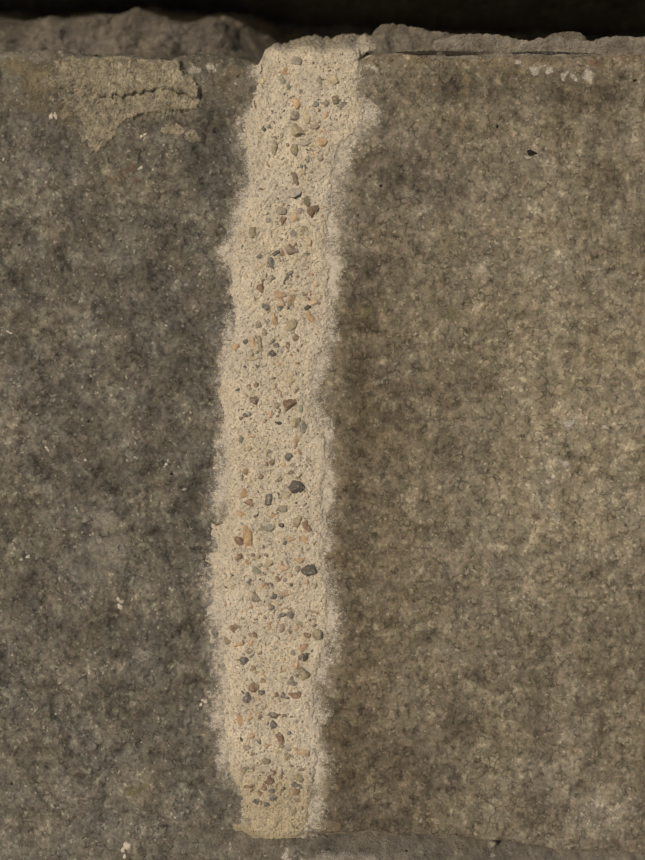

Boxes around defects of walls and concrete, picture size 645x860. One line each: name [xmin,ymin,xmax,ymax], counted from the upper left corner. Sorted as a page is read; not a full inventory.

peeling [34,54,204,157]
leakage [208,67,261,523]
leakage [311,93,380,730]
leakage [198,538,240,790]
leakage [292,742,332,838]